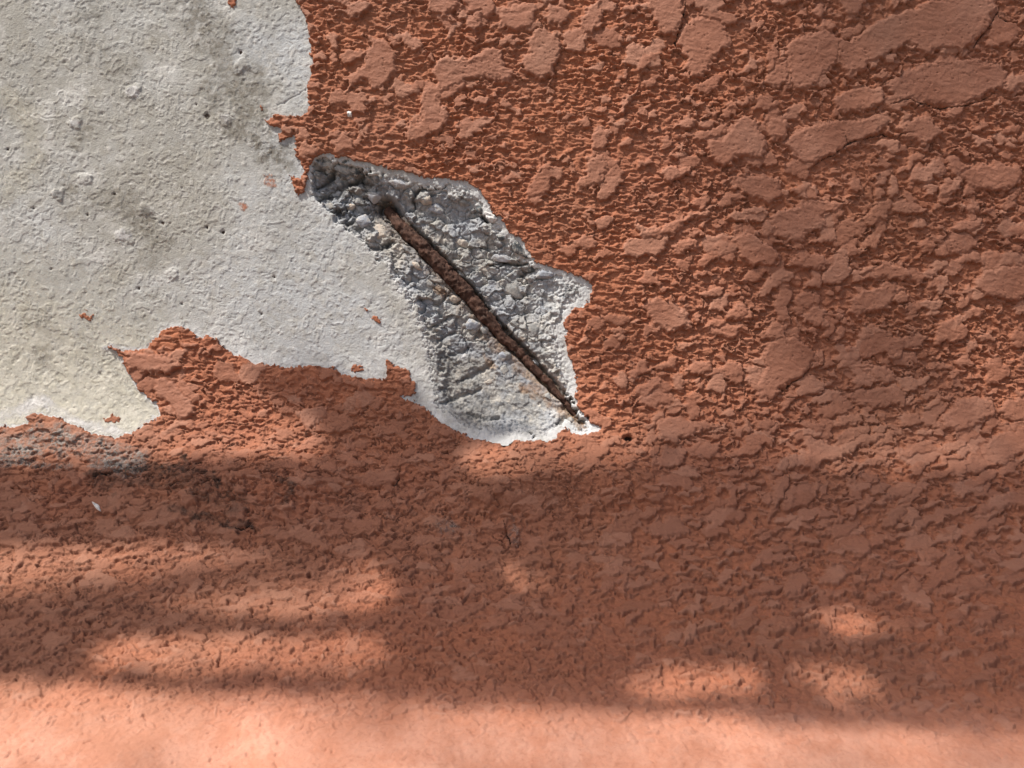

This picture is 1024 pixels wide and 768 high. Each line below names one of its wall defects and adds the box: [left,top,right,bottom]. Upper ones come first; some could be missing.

peeling [0,0,601,446]